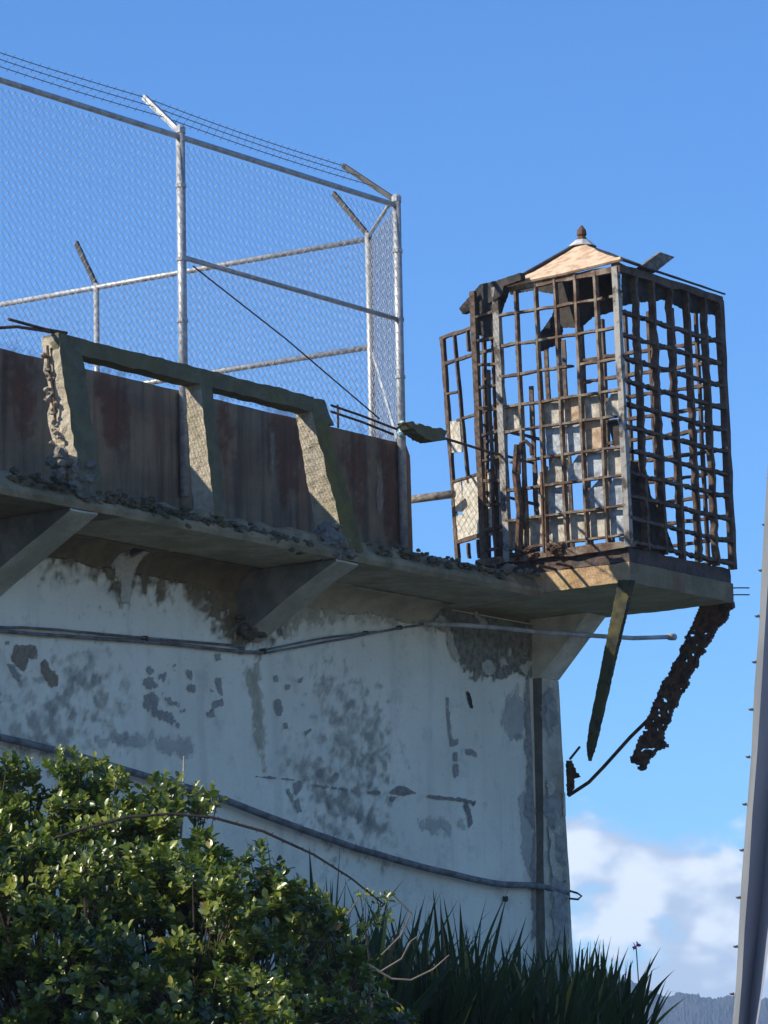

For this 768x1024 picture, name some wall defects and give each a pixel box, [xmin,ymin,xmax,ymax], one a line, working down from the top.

spalling [0,318,314,555]
peeling [5,641,58,687]
peeling [95,664,196,759]
peeling [206,678,224,717]